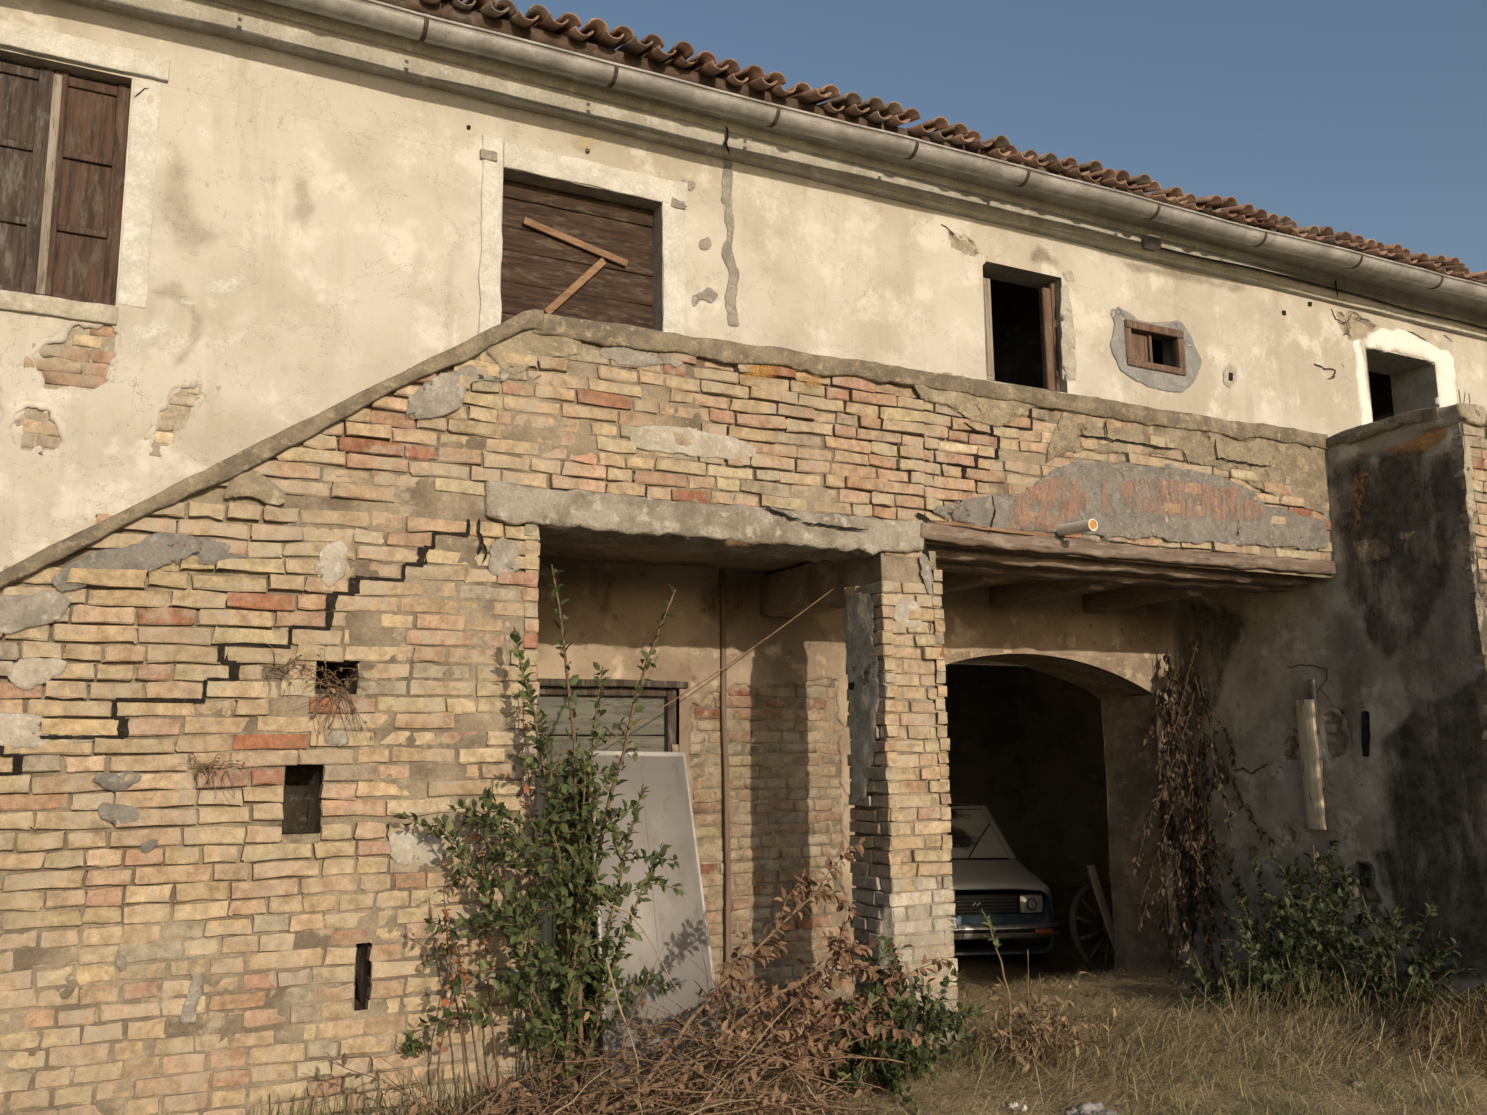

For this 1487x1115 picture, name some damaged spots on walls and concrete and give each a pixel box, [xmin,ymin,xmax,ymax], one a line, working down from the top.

crack [723,126,731,155]
flaking render [2,318,166,460]
peeling [144,377,221,457]
damp [1332,451,1464,654]
damp [1376,674,1487,978]